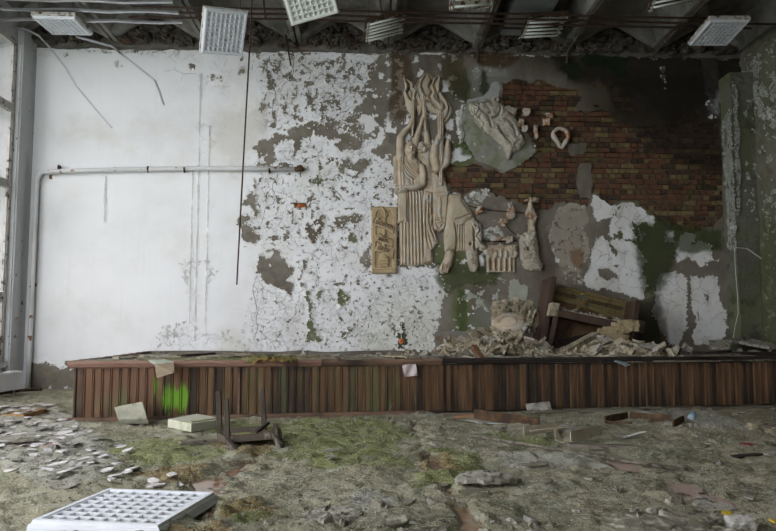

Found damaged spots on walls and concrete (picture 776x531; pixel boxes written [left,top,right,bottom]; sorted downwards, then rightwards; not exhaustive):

flaking render [234,22,776,352]